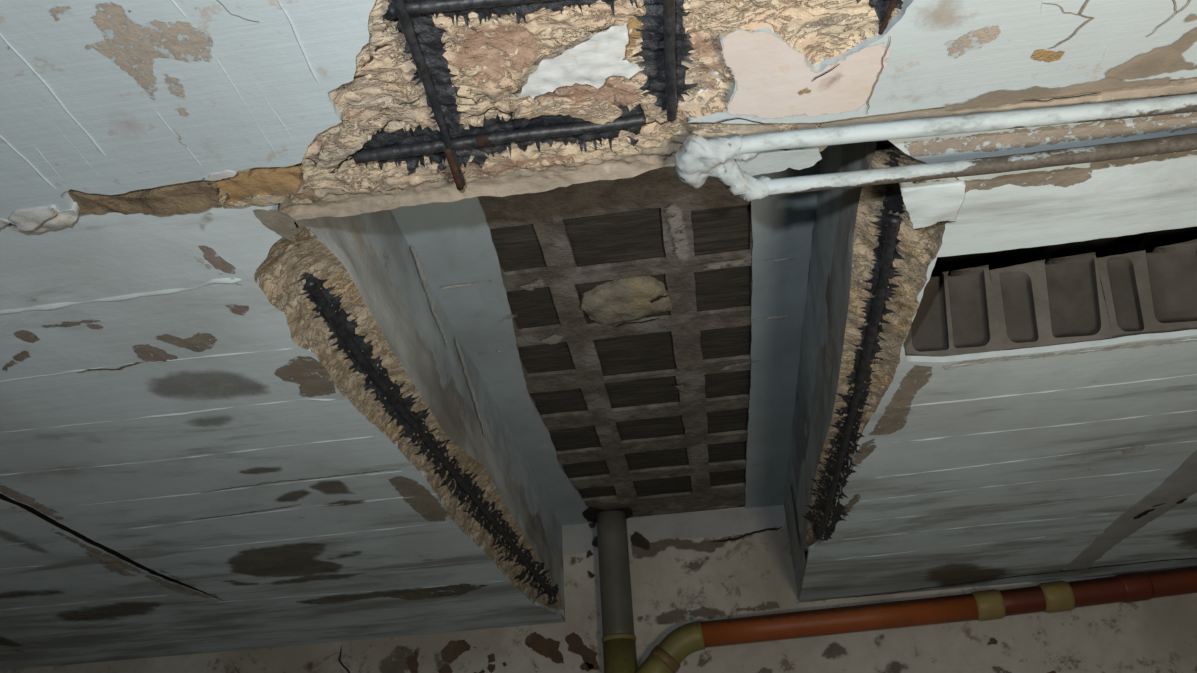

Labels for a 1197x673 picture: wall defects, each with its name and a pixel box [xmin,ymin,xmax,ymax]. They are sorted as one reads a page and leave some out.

crack [1043,0,1094,49]
crack [1146,0,1191,37]
spalling [869,140,926,169]
peeling [914,151,1197,193]
spalling [68,0,904,611]
leakage [154,373,263,397]
spalling [805,185,1197,551]
crack [0,485,224,601]
leakage [226,543,360,585]
leakage [1176,530,1197,548]
peeling [435,640,475,673]
peeling [525,632,599,671]